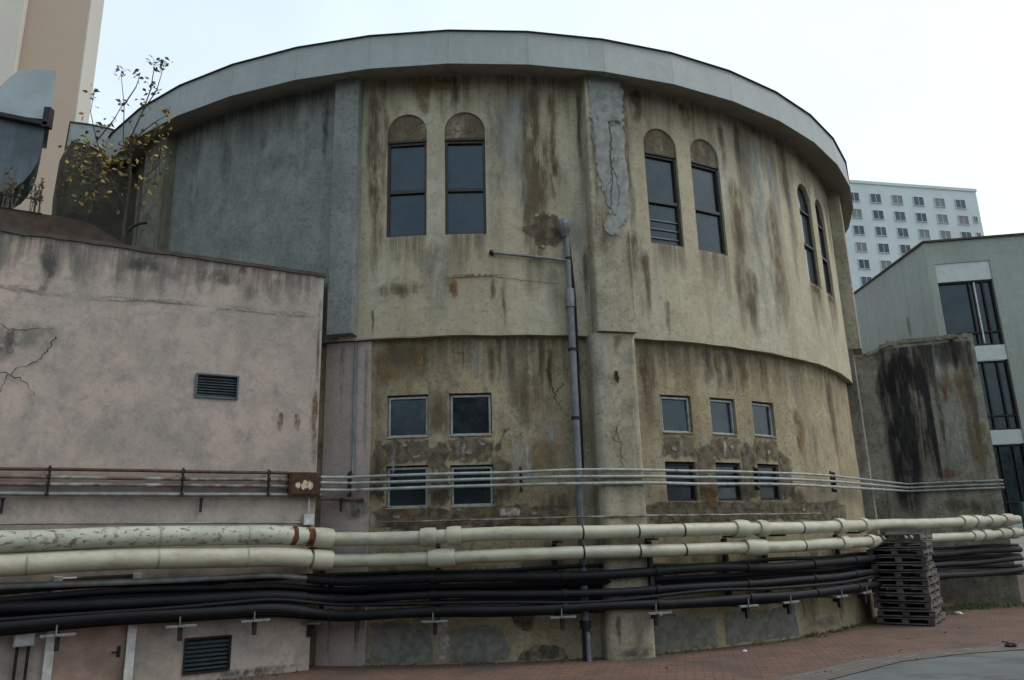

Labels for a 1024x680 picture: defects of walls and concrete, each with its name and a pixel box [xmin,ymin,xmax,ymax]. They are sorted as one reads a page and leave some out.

damp [498,75,557,249]
peeling [588,75,631,236]
crack [606,126,620,208]
corrosion [446,274,555,306]
spalling [522,206,562,248]
damp [730,186,757,320]
crack [0,323,57,393]
corrosion [279,392,318,440]
crack [545,368,563,403]
damp [877,339,973,506]
spalling [371,428,569,531]
spalling [646,435,847,524]